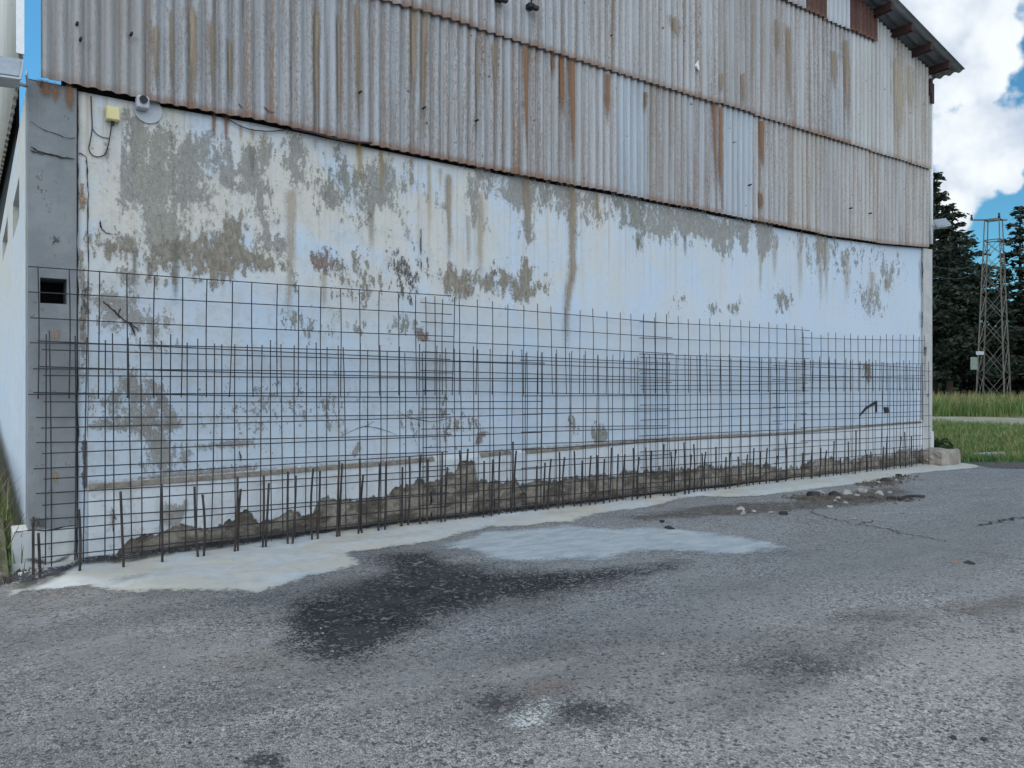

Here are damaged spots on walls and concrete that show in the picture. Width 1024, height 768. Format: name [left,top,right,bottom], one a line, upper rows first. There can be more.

corrosion [38,80,73,107]
corrosion [151,12,175,84]
corrosion [189,8,243,108]
corrosion [212,112,228,137]
corrosion [353,4,362,115]
corrosion [411,8,428,130]
corrosion [522,43,530,154]
corrosion [551,51,577,158]
corrosion [712,104,722,186]
corrosion [775,20,791,97]
corrosion [831,42,850,107]
peeling [28,108,932,567]